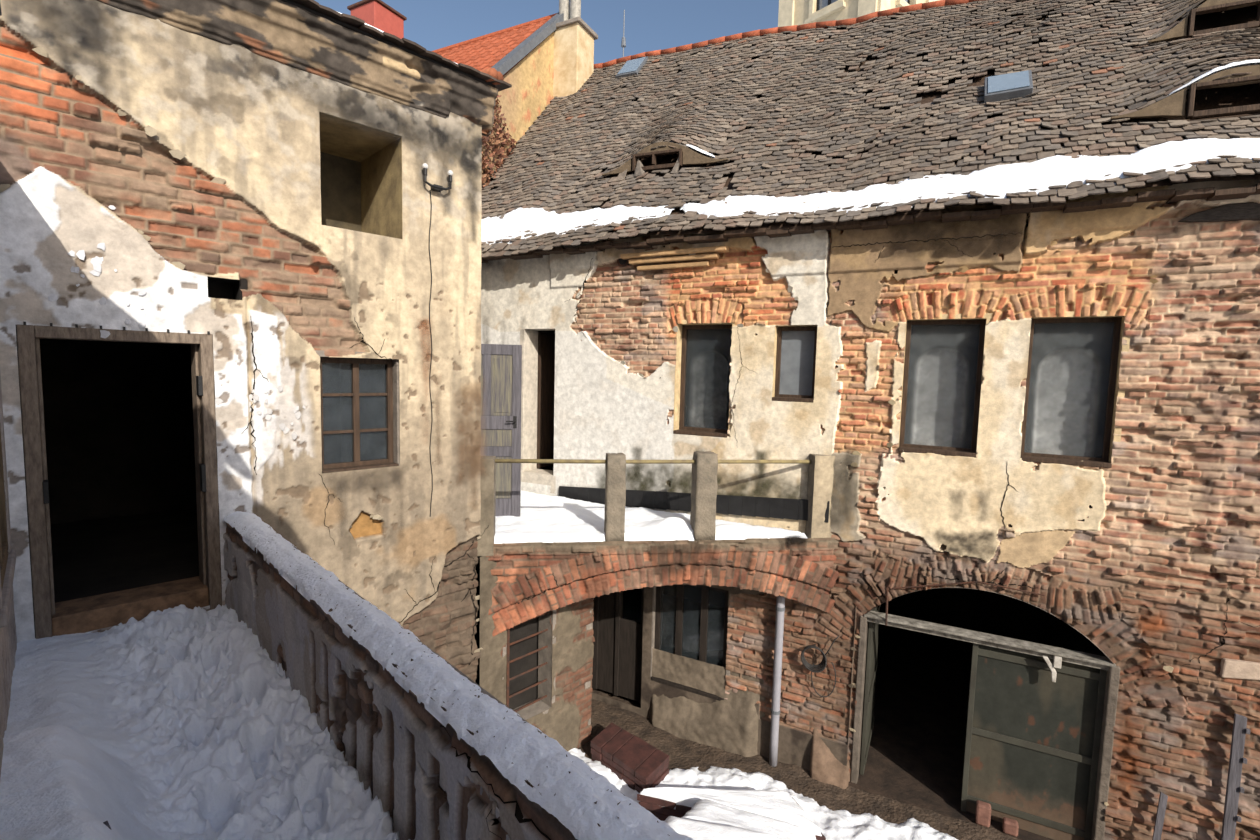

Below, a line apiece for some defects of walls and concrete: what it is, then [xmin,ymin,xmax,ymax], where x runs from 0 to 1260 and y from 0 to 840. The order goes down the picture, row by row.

spalling [0,21,370,356]
spalling [570,235,799,378]
spalling [349,510,385,538]
spalling [724,200,1260,840]
crack [1000,467,1016,535]
crack [440,726,551,840]